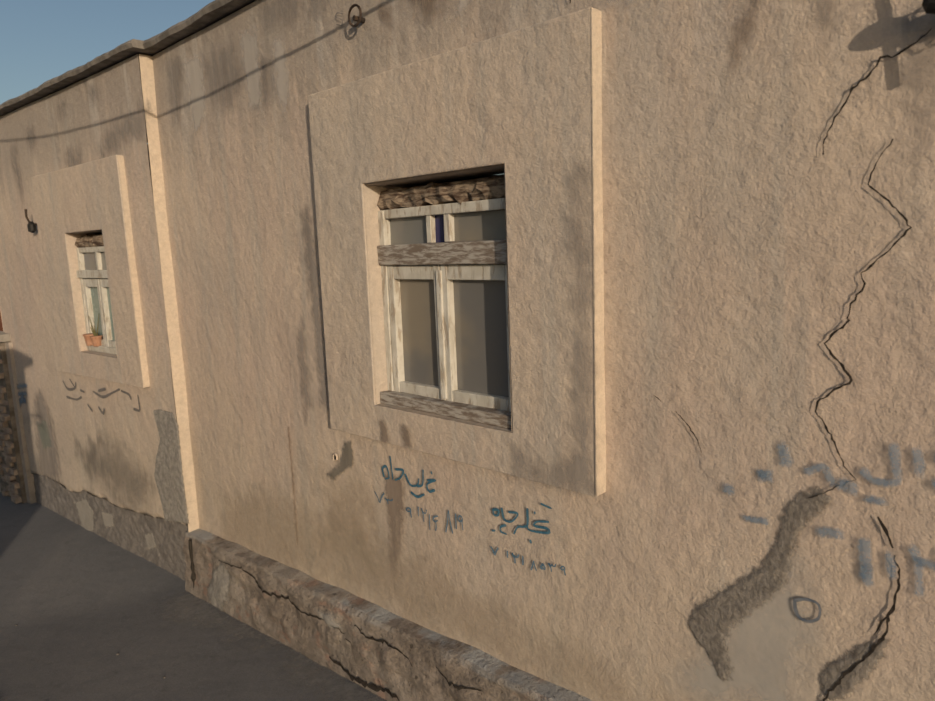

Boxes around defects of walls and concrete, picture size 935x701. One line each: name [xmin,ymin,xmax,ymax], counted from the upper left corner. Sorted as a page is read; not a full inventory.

damp [214,34,289,107]
crack [822,28,932,155]
crack [809,139,912,498]
crack [188,540,196,588]
crack [218,560,412,700]
crack [436,667,481,691]
crack [823,516,900,701]